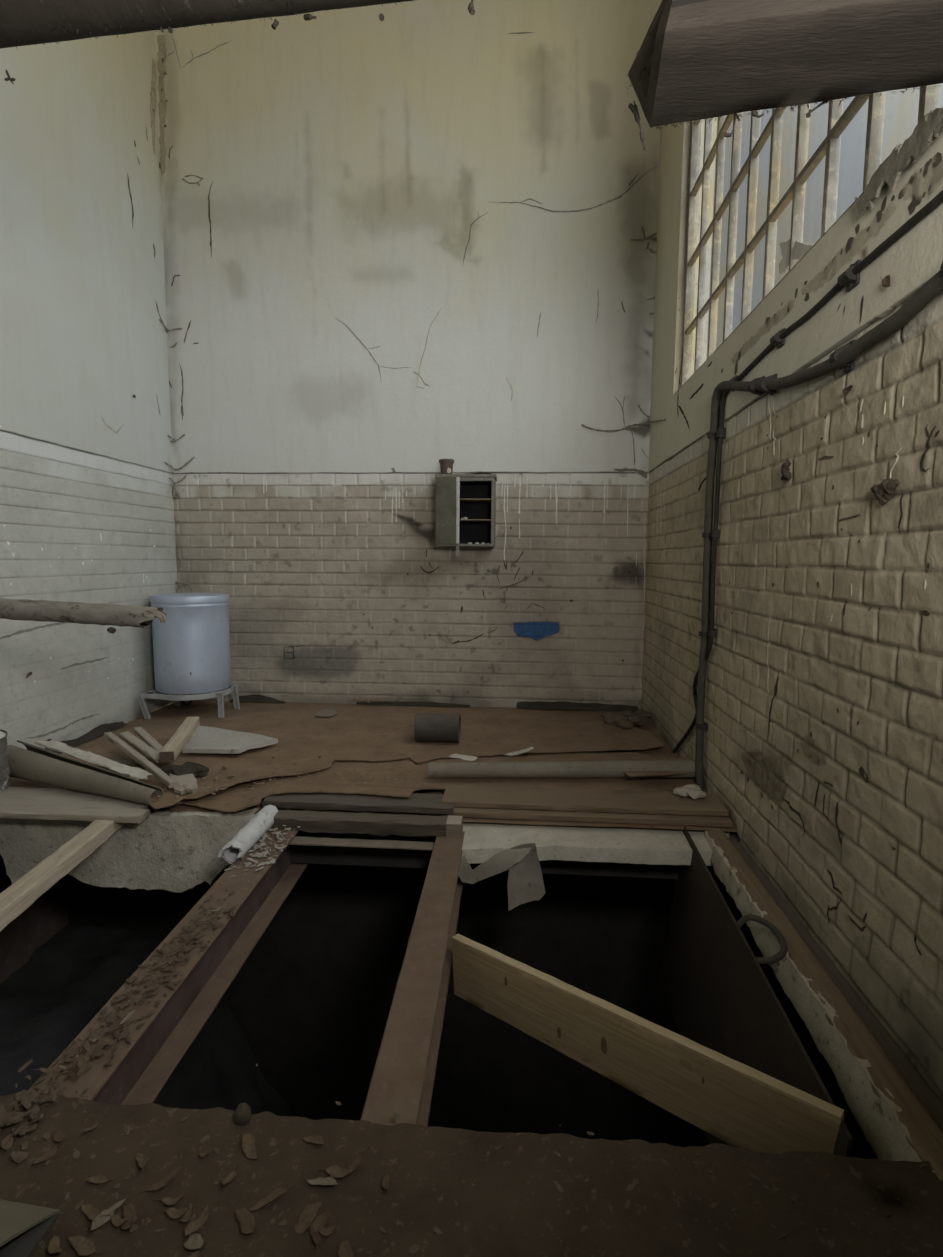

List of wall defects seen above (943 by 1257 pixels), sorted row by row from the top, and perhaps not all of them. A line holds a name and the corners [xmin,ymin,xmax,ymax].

crack [463,165,658,263]
spalling [721,152,943,375]
crack [335,308,442,389]
crack [783,781,867,932]